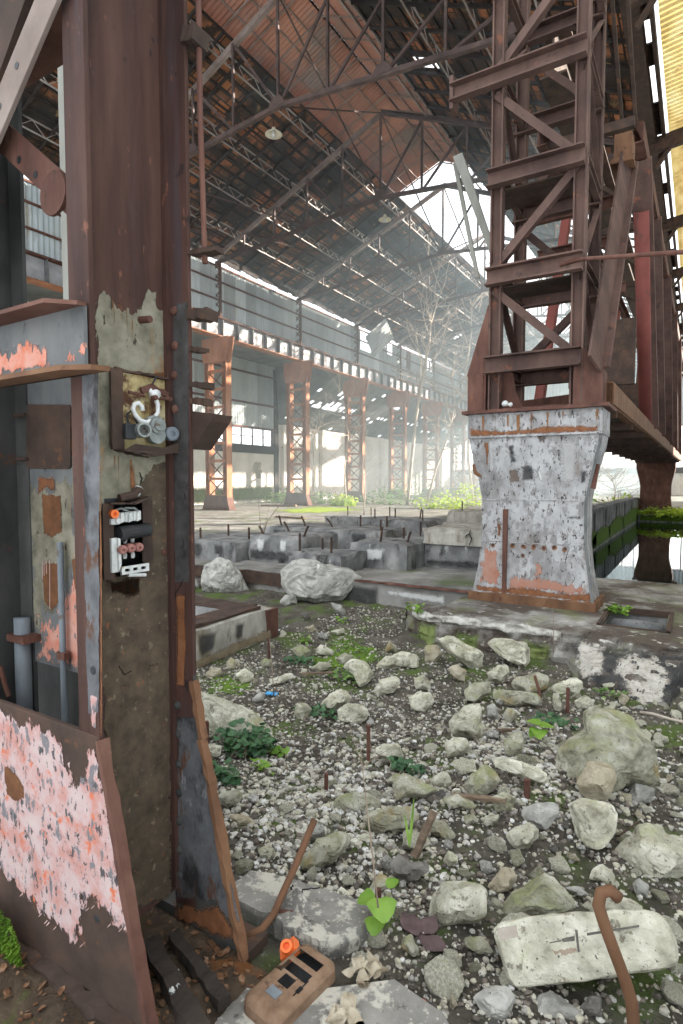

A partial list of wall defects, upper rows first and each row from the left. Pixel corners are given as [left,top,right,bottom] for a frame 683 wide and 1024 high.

peeling [0,341,49,375]
rust [471,409,599,464]
rust [38,477,62,538]
peeling [30,288,190,728]
peeling [479,548,585,595]
rust [477,585,590,602]
rust [510,543,567,558]
peeling [0,710,127,947]
rust [0,925,95,1024]
rust [146,904,263,993]